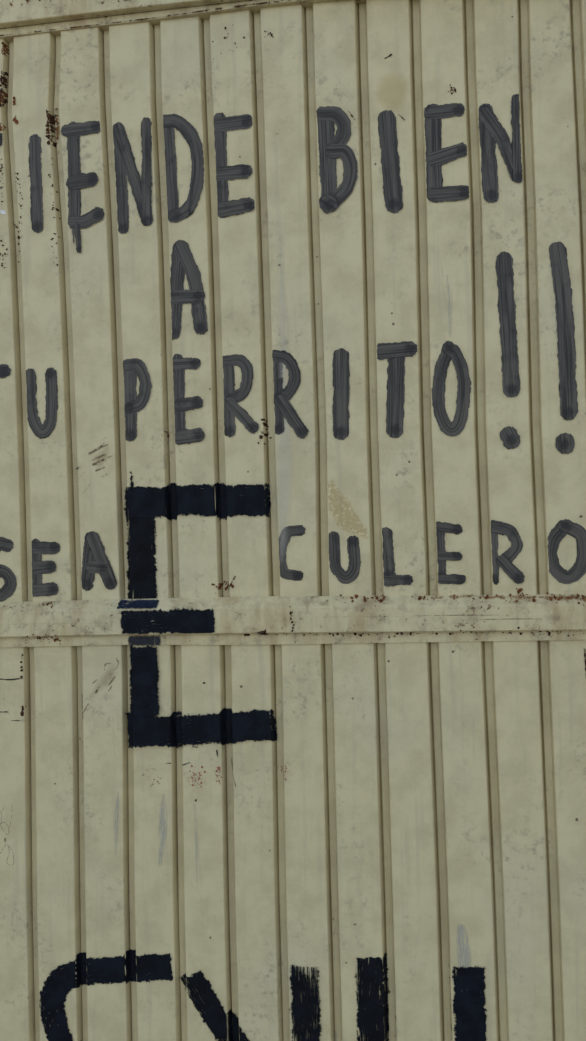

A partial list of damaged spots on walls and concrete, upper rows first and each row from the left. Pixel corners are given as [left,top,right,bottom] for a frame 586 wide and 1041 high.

rust [70,0,289,29]
rust [0,71,18,131]
rust [45,108,59,147]
rust [412,588,586,604]
rust [243,606,472,638]